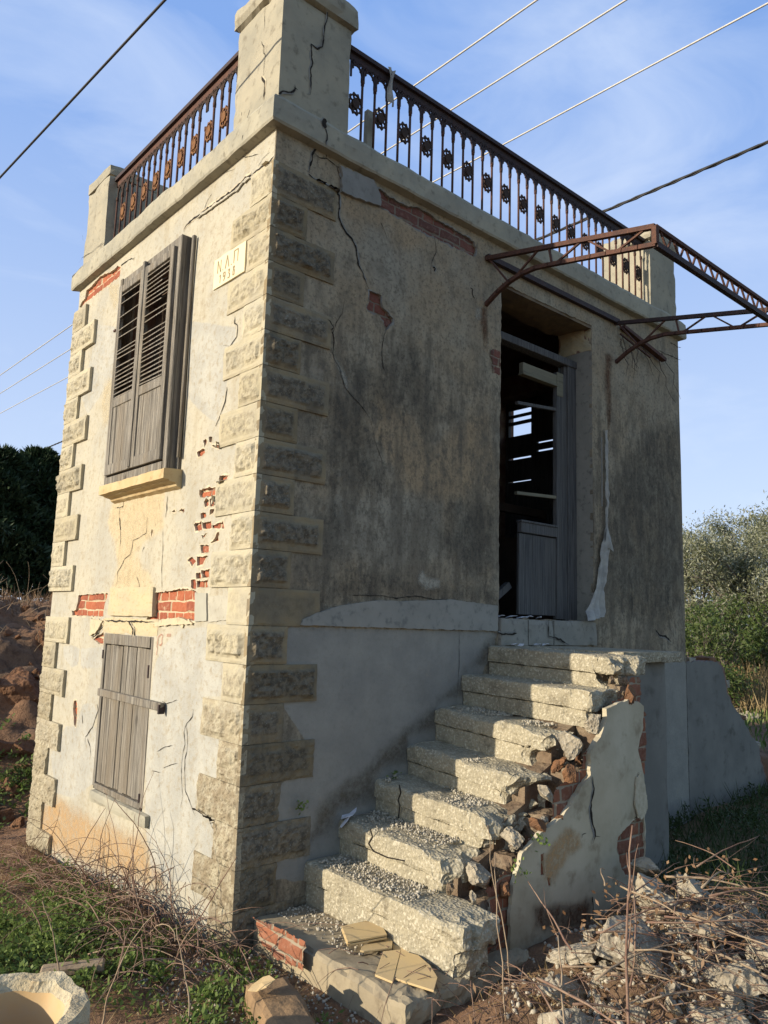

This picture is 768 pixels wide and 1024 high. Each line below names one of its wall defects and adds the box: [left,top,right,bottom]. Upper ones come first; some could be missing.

crack [184,11,328,231]
crack [308,117,370,289]
flaking render [339,165,477,256]
flaking render [366,289,394,332]
flaking render [196,436,220,458]
flaking render [146,473,229,628]
flaking render [72,592,108,645]
crack [154,700,214,829]
crack [368,829,405,861]
flaking render [617,712,648,879]